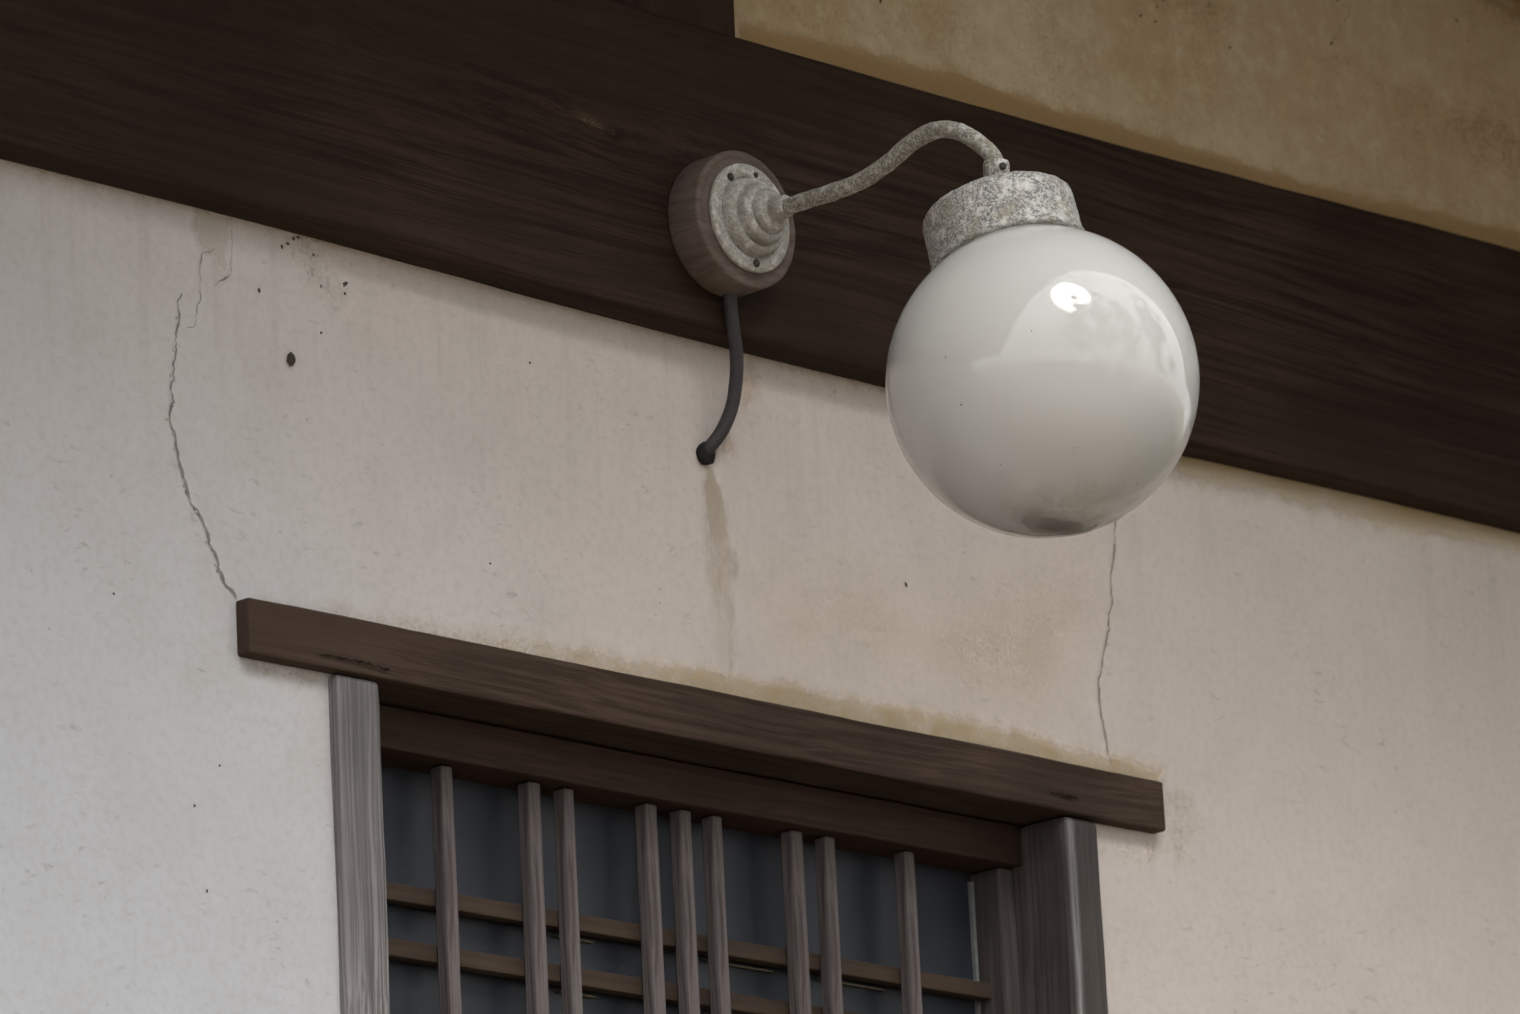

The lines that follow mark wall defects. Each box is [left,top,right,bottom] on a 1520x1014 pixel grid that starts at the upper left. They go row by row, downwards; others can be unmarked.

crack [165,216,237,598]
crack [1098,521,1116,765]